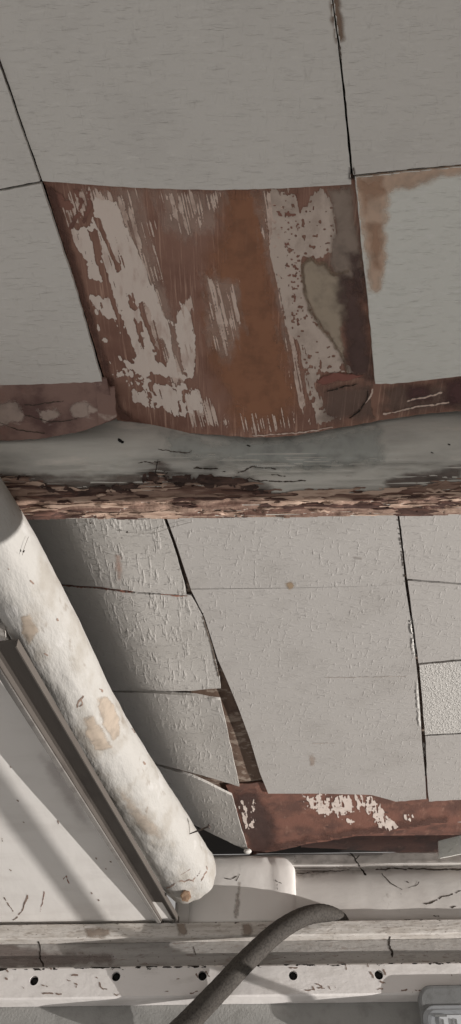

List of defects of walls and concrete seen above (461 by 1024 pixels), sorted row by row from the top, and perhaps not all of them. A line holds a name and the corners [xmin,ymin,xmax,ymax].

peeling [55,190,204,417]
corrosion [206,195,293,423]
peeling [269,188,351,425]
water stain [301,164,461,417]
peeling [303,794,414,831]